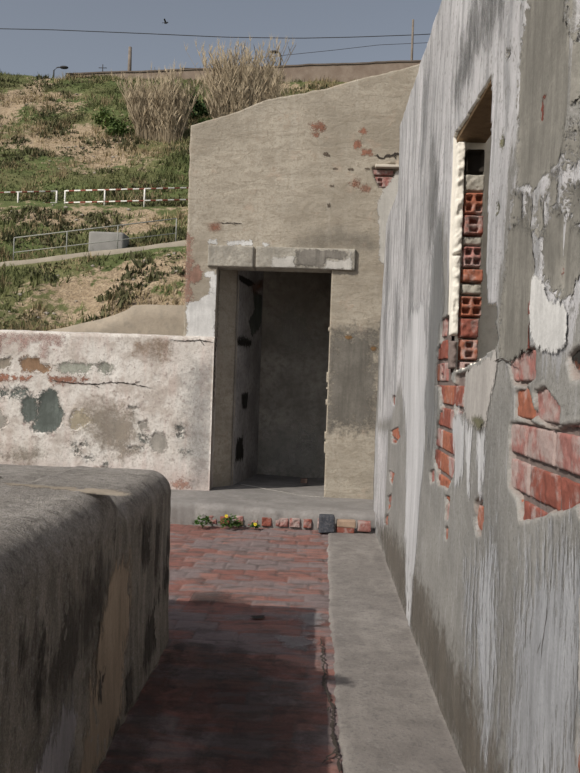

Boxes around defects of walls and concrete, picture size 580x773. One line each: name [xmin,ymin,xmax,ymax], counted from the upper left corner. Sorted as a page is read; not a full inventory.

damp [455,0,501,95]
crack [374,151,399,159]
flaking render [0,354,114,435]
crack [48,378,153,389]
crack [171,283,220,407]
peeling [185,264,217,337]
flaking render [432,318,466,539]
flaking render [496,0,580,520]
damp [26,553,109,709]
damp [141,519,170,673]
crack [319,634,341,773]